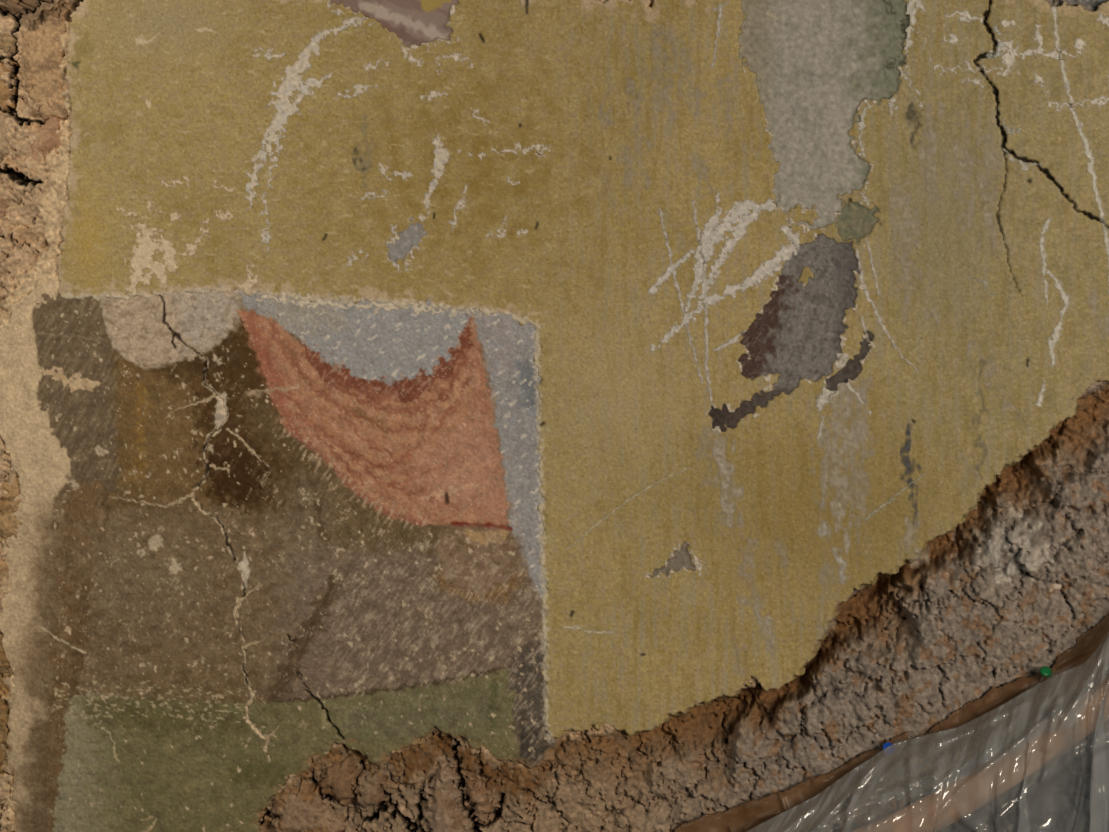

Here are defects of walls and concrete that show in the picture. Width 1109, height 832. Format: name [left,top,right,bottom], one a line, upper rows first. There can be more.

spalling [213,0,474,251]
crack [974,0,1109,296]
peeling [1034,73,1109,111]
peeling [117,196,234,296]
peeling [386,134,551,272]
peeling [705,0,1085,433]
crack [110,294,296,761]
spalling [645,542,702,578]
crack [296,671,344,739]
crack [140,815,158,832]
crack [363,790,427,832]
crack [452,741,505,832]